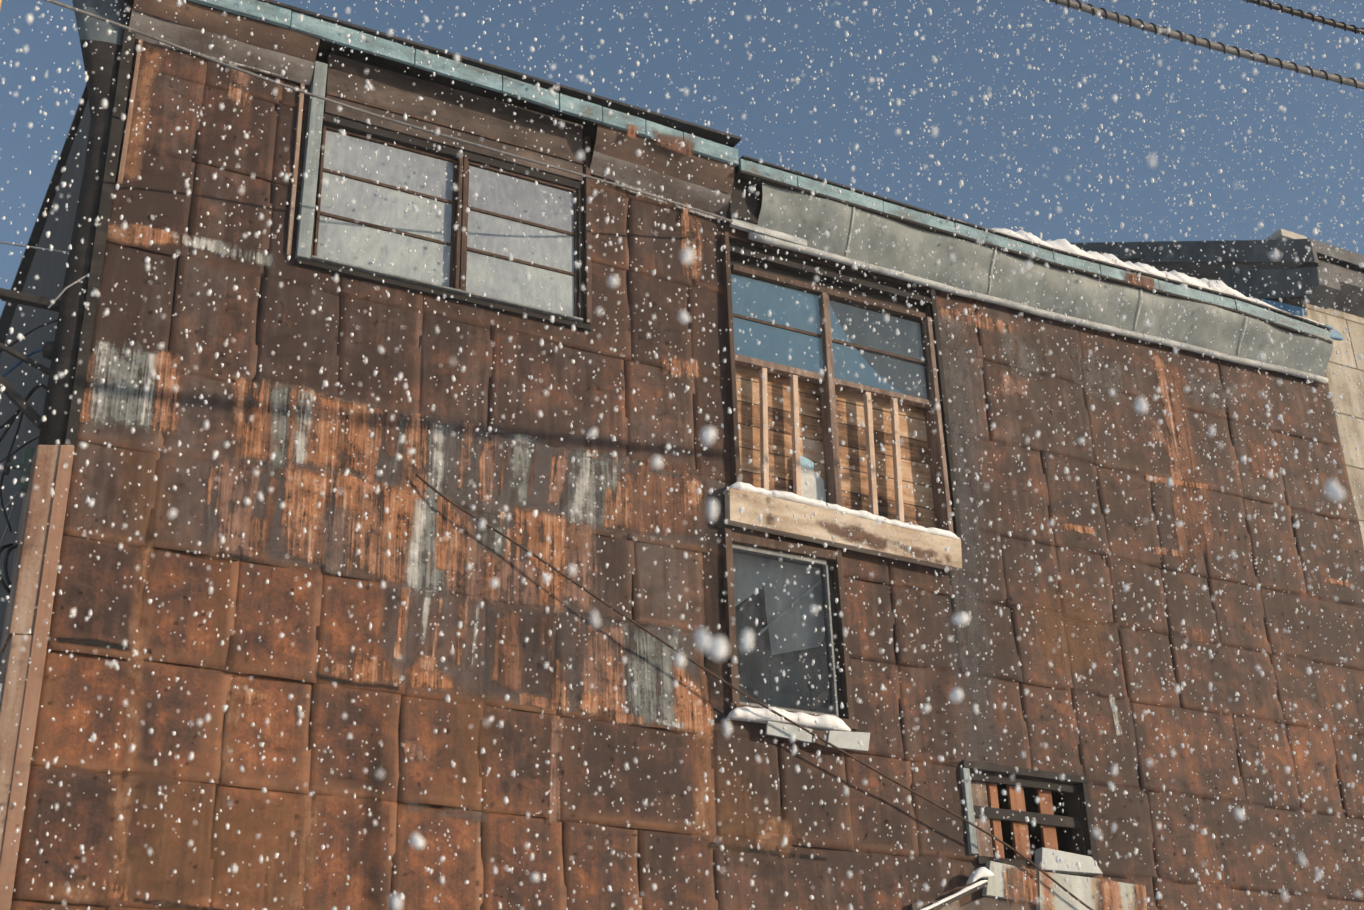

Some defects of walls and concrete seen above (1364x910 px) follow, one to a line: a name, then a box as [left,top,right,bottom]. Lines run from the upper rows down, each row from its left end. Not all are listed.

corrosion [229,66,251,107]
peeling [79,341,180,432]
peeling [385,411,451,592]
peeling [548,449,620,528]
corrosion [1062,523,1094,534]
corrosion [1146,355,1214,566]
corrosion [1248,439,1281,481]
corrosion [205,376,702,823]
peeling [615,627,712,734]
corrosion [48,701,138,902]
corrosion [694,733,712,836]
corrosion [1003,866,1039,904]